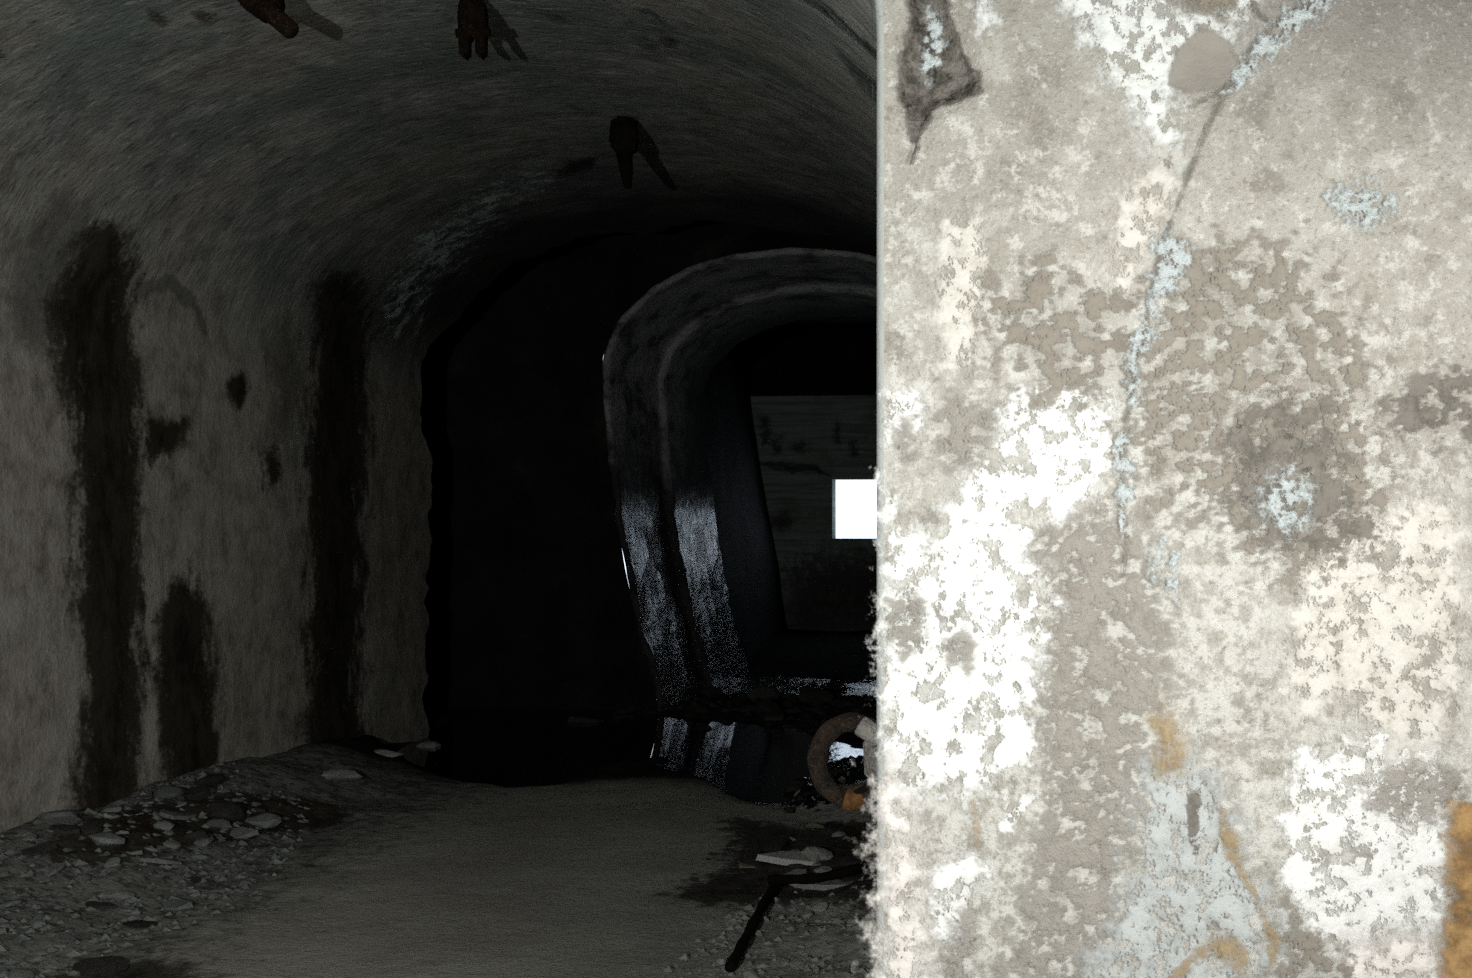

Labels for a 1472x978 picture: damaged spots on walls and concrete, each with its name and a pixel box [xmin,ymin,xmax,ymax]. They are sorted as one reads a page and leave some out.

spalling [898,0,1000,165]
peeling [1058,0,1258,314]
leakage [1323,179,1397,230]
leakage [14,200,353,867]
leakage [260,157,597,743]
leakage [973,203,1472,602]
leakage [1082,759,1356,978]
leakage [1362,760,1465,825]